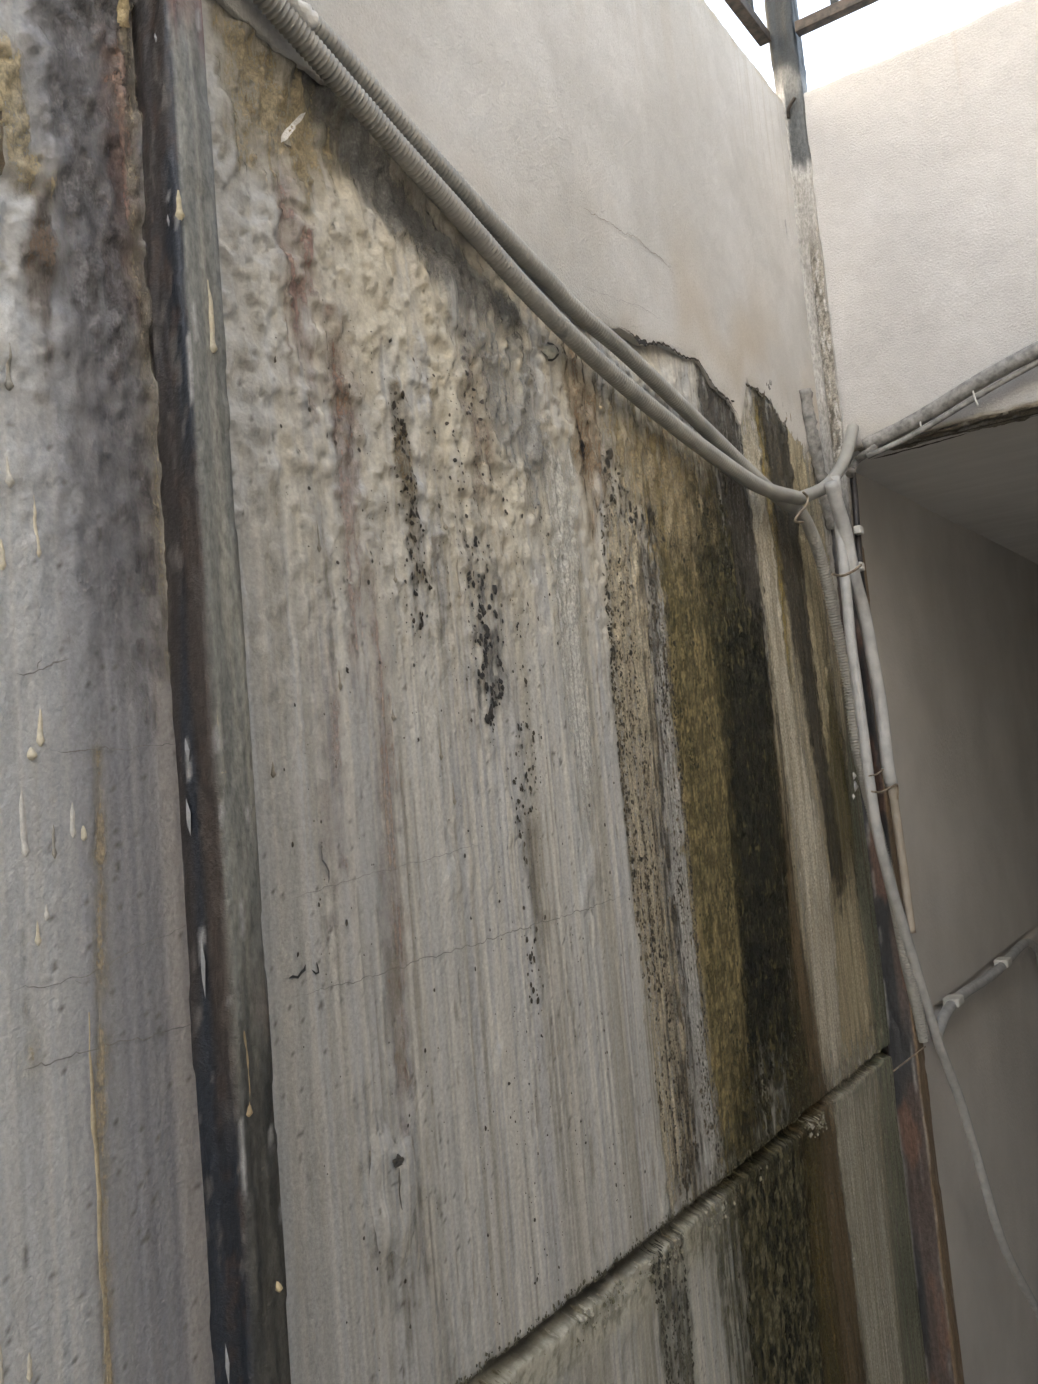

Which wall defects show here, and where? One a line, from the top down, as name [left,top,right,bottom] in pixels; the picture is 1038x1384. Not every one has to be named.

damp [213,7,928,1384]
peeling [621,327,739,419]